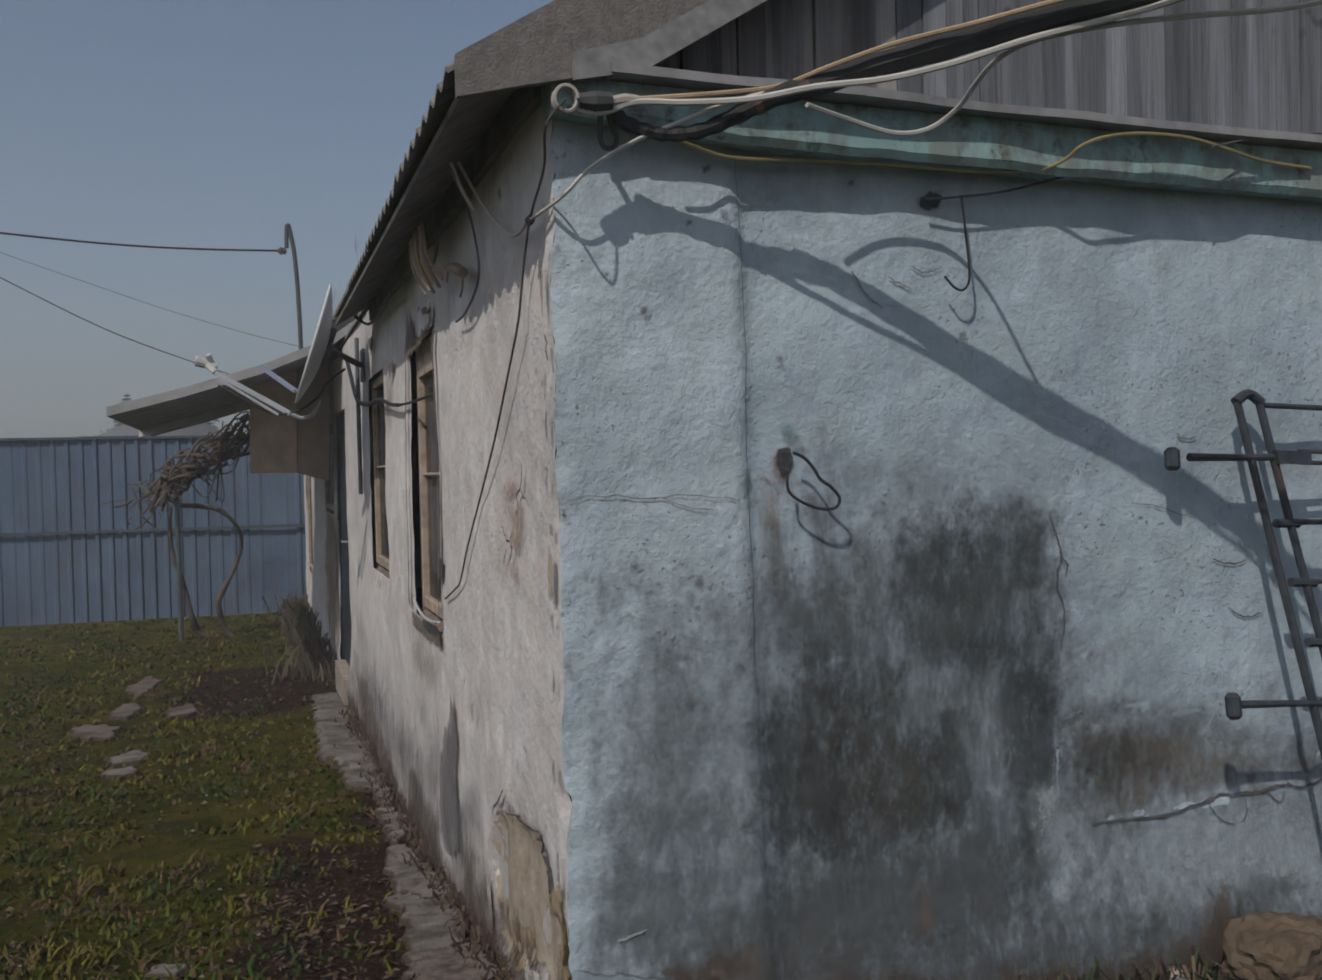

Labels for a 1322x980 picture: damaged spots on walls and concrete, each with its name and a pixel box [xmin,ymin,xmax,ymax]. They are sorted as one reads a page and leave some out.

flaking render [405,302,442,648]
damp [347,677,516,977]
flaking render [483,810,570,980]
damp [551,884,572,980]
damp [699,529,1297,980]
crack [1092,778,1322,826]